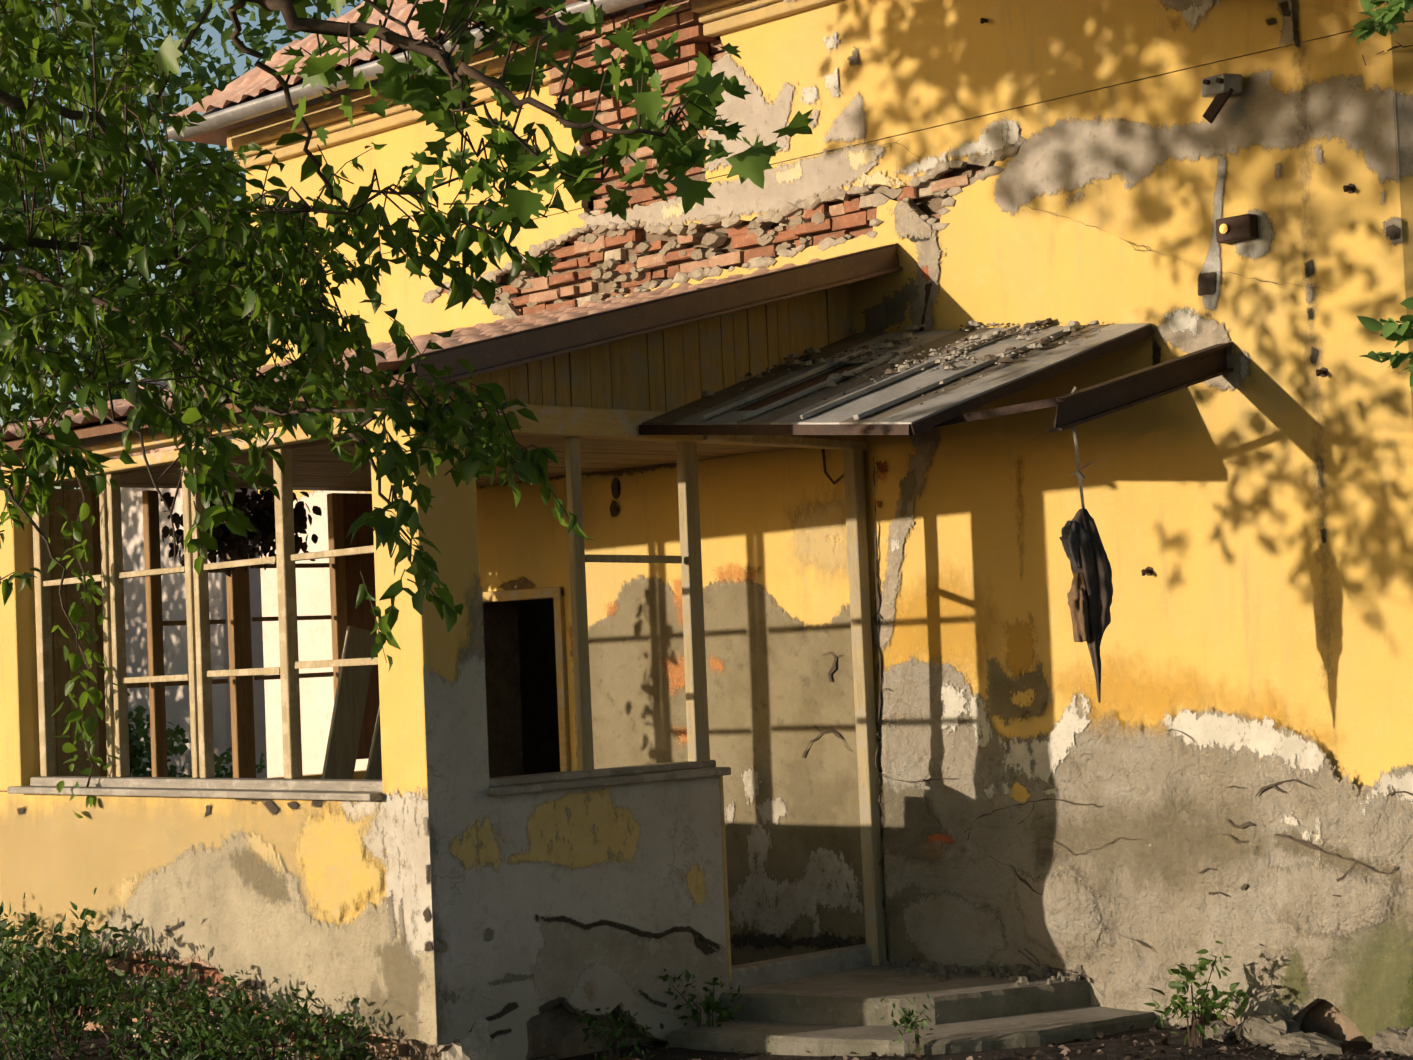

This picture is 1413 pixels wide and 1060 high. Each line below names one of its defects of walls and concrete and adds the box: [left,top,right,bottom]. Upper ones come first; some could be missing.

flaking render [421,282,451,304]
peeling [470,0,1413,319]
crack [1028,206,1180,260]
peeling [293,490,367,775]
peeling [0,539,866,1060]
crack [1018,948,1103,996]
peeling [875,654,1413,1029]
crack [1199,779,1397,897]